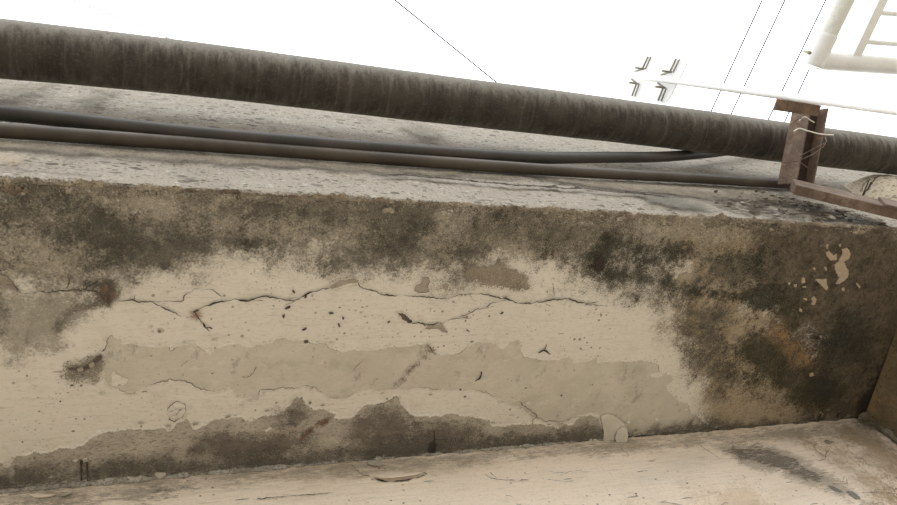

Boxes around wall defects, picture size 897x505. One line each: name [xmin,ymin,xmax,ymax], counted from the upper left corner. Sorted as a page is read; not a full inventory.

leakage [0,139,516,179]
spalling [0,175,897,236]
flaking render [100,284,116,305]
crack [119,288,329,332]
peeling [378,311,413,325]
peeling [413,275,450,294]
leakage [0,178,897,438]
peeling [464,261,529,292]
crack [358,280,651,326]
peeling [674,272,757,293]
peeling [813,244,861,291]
peeling [0,322,712,498]